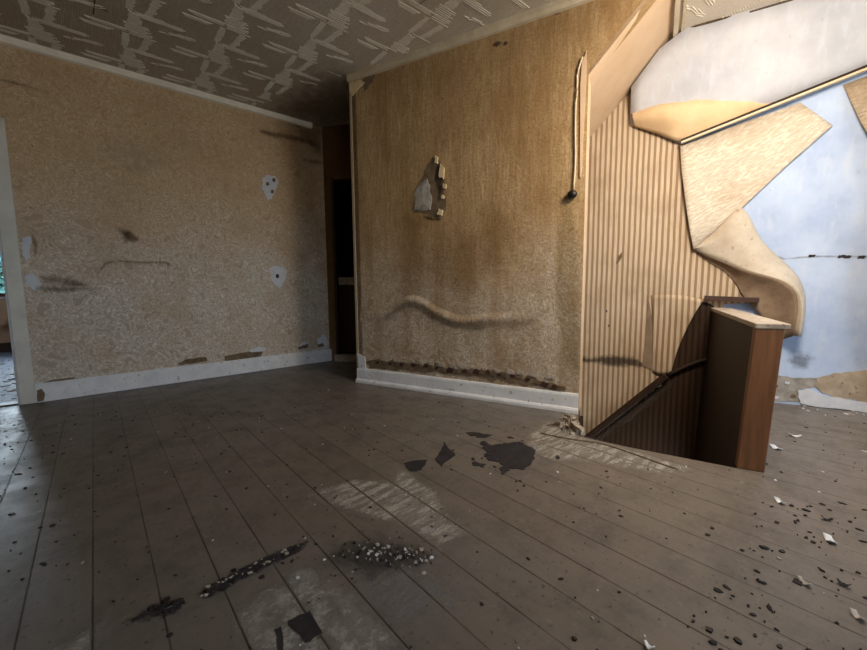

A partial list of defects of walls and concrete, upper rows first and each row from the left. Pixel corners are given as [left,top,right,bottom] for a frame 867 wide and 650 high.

flaking render [262,175,279,201]
flaking render [413,155,447,219]
flaking render [775,375,867,413]